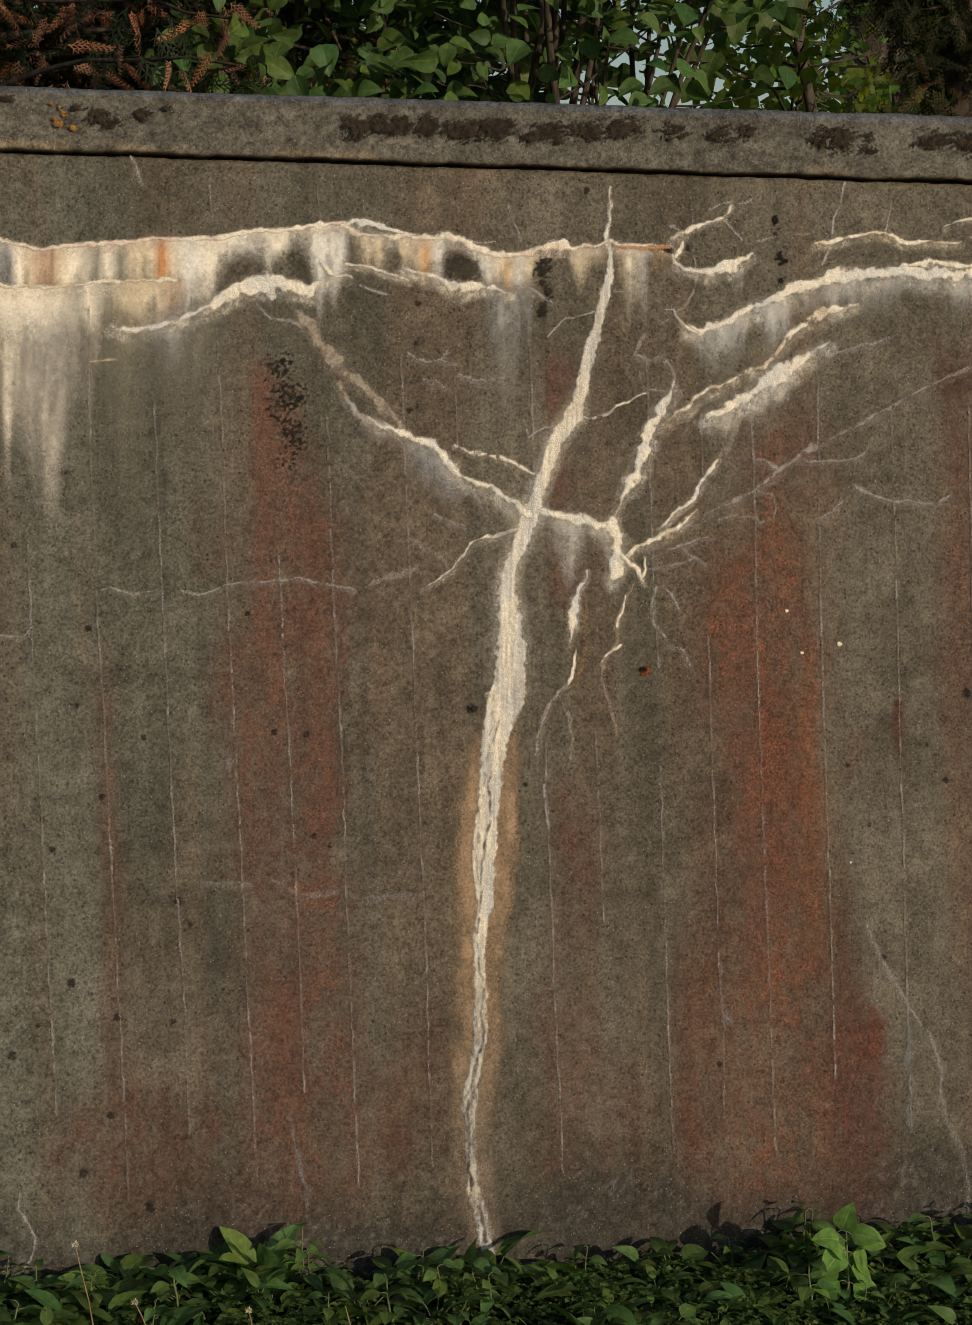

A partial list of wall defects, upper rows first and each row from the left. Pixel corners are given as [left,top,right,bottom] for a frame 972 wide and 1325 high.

water stain [0,182,972,468]
crack [181,187,972,1255]
water stain [452,734,518,1263]